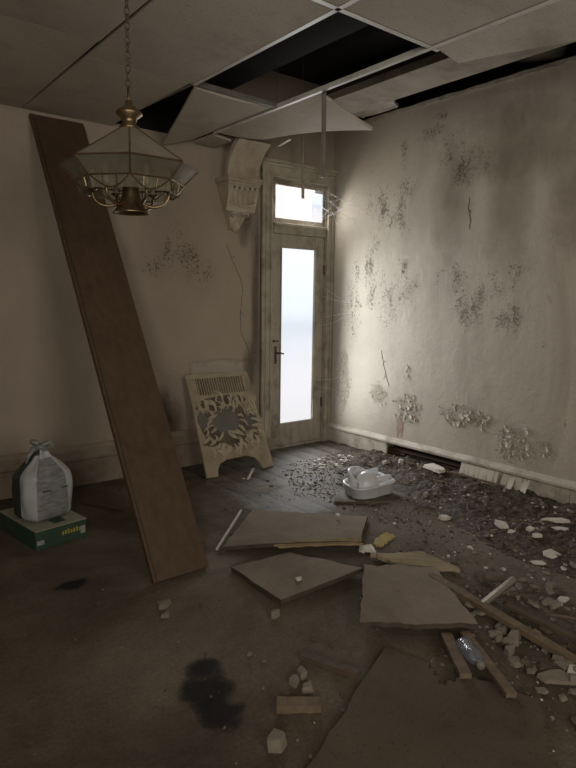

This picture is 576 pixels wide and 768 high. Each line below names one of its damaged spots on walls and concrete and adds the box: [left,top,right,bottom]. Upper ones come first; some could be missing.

peeling [370,381,421,425]